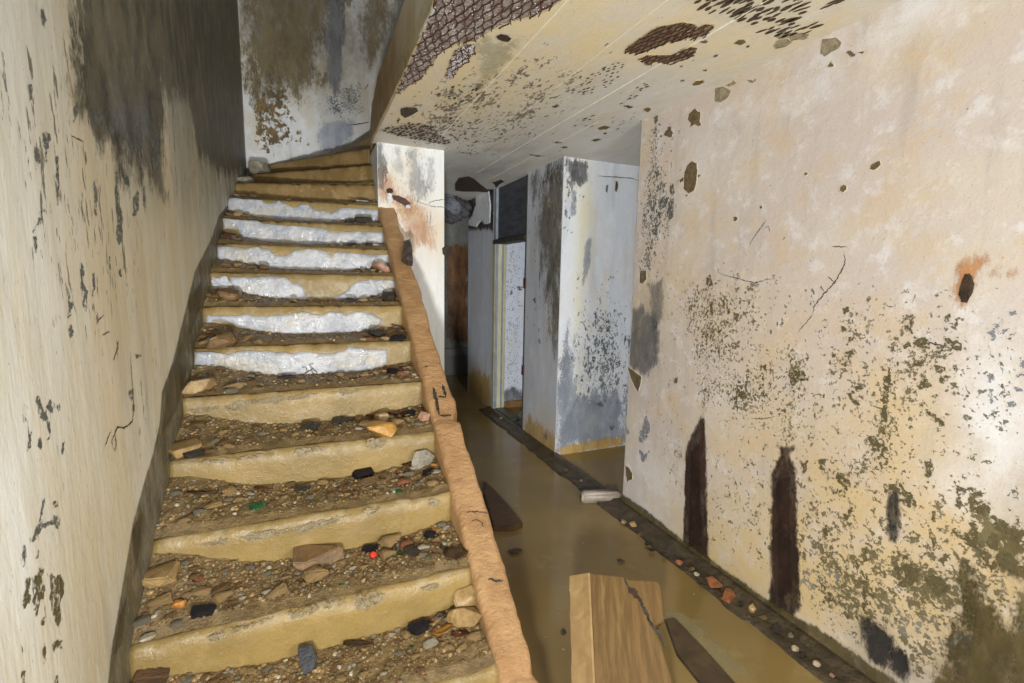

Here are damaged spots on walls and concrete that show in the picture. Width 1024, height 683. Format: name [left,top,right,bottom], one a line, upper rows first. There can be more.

water stain [69,0,352,198]
crack [96,315,134,450]
peeling [194,347,387,376]
peeling [206,198,395,334]
water stain [525,158,627,454]
peeling [636,115,700,285]
crack [799,246,846,331]
corrosion [956,258,995,305]
water stain [683,418,709,558]
water stain [769,446,800,615]
water stain [856,614,910,680]
water stain [935,561,1024,683]